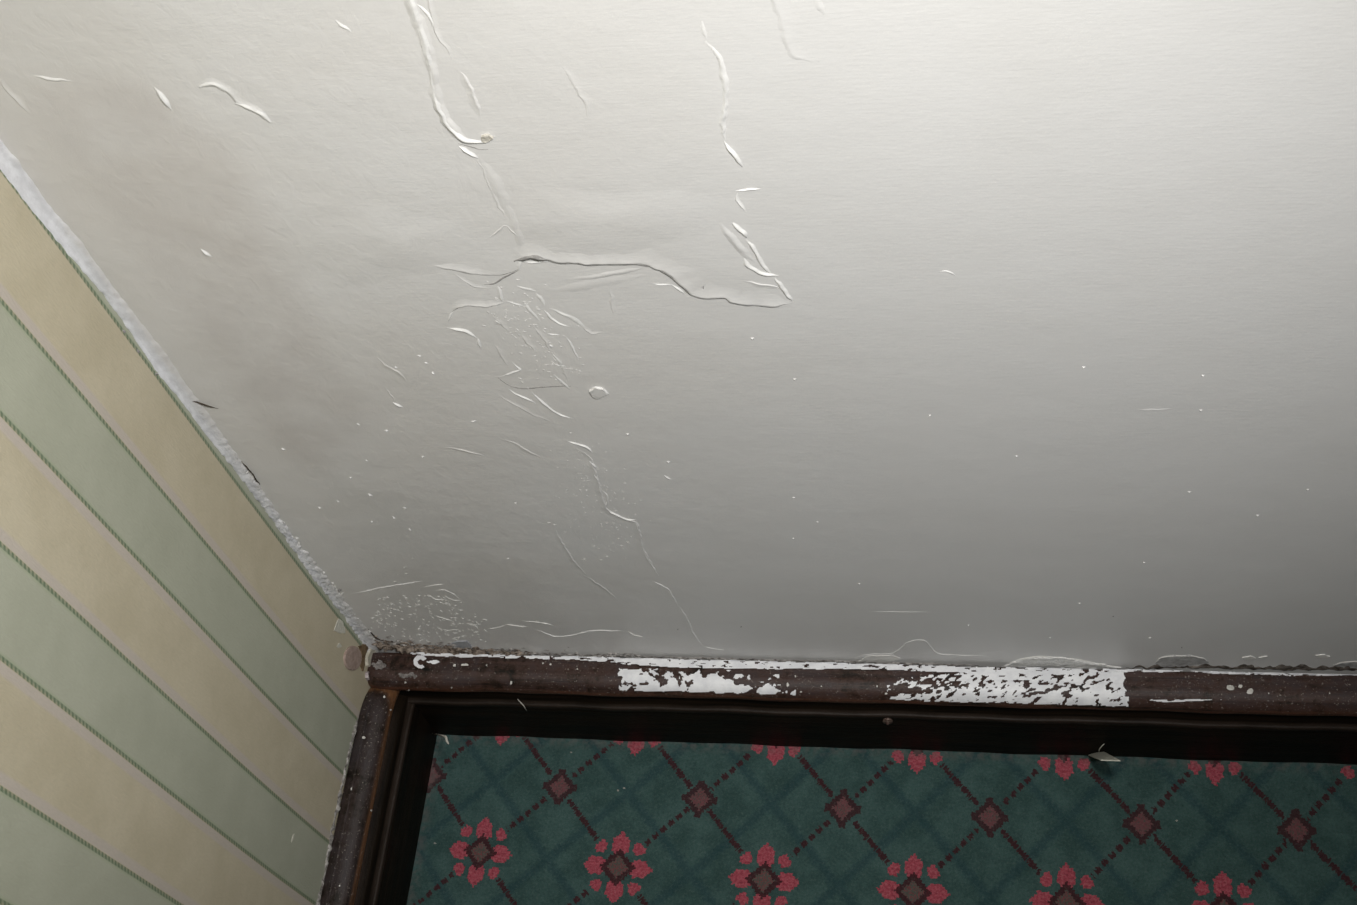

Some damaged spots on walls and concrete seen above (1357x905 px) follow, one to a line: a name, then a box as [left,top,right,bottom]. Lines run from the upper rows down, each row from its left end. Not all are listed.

peeling [432,223,793,423]